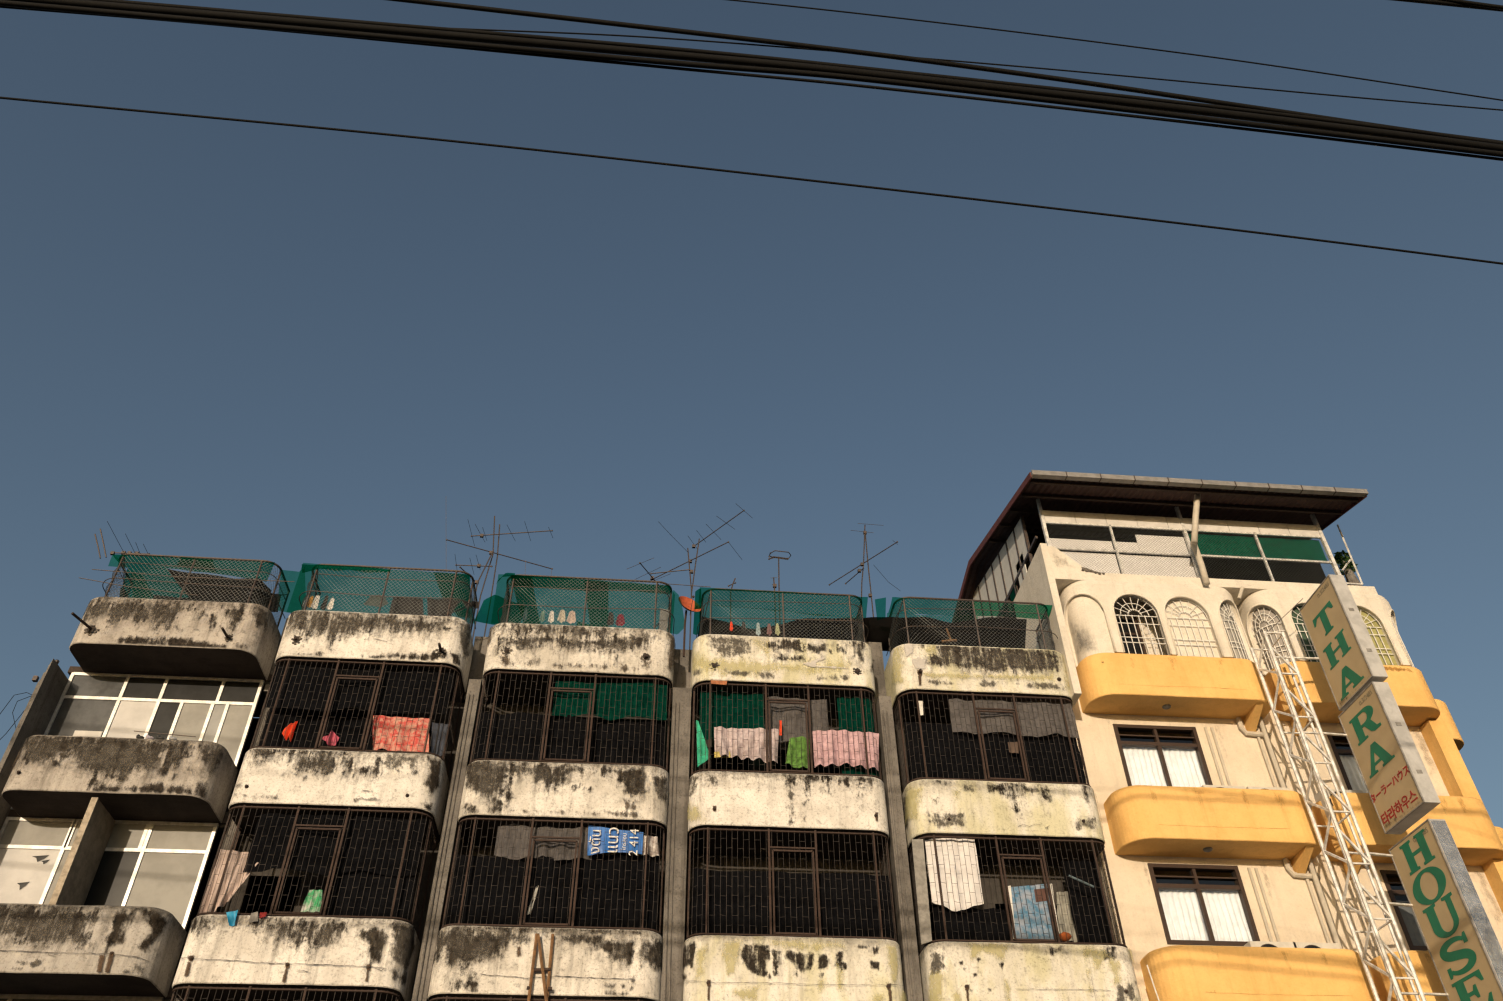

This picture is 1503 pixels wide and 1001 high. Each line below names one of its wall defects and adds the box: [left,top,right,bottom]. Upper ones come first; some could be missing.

damp [84,599,269,648]
damp [286,610,676,672]
damp [709,635,874,678]
damp [920,644,1060,689]
damp [11,736,223,798]
damp [250,749,442,810]
damp [464,761,668,817]
damp [785,775,908,827]
damp [928,780,1051,828]
damp [0,905,168,976]
damp [248,918,415,985]
damp [433,927,663,995]